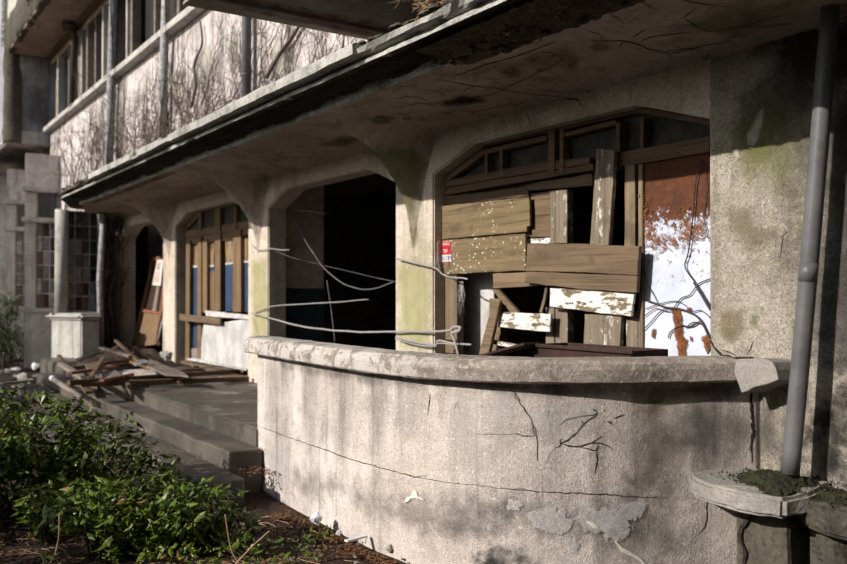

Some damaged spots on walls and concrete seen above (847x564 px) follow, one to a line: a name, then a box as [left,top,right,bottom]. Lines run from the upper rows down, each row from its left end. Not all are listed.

spalling [416,0,645,66]
crack [588,0,792,55]
damp [70,0,535,203]
damp [741,28,819,144]
damp [370,149,425,214]
corrosion [637,195,710,258]
corrosion [672,307,710,356]
crack [259,426,653,498]
crack [482,390,624,470]
crack [749,393,757,463]
peeling [506,499,646,553]